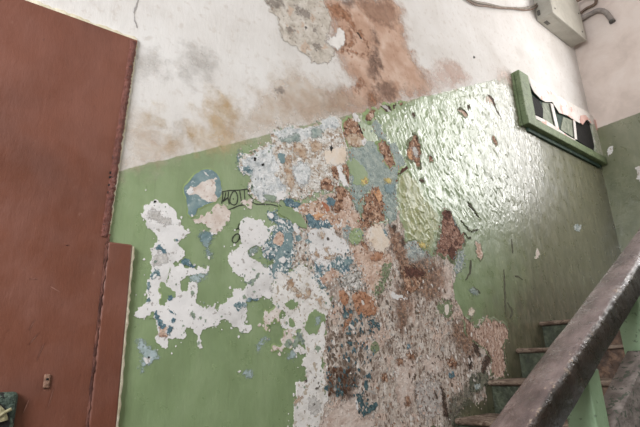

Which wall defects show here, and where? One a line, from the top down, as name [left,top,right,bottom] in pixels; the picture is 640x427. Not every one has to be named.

flaking render [265,0,347,64]
water stain [249,0,464,131]
flaking render [134,100,509,427]